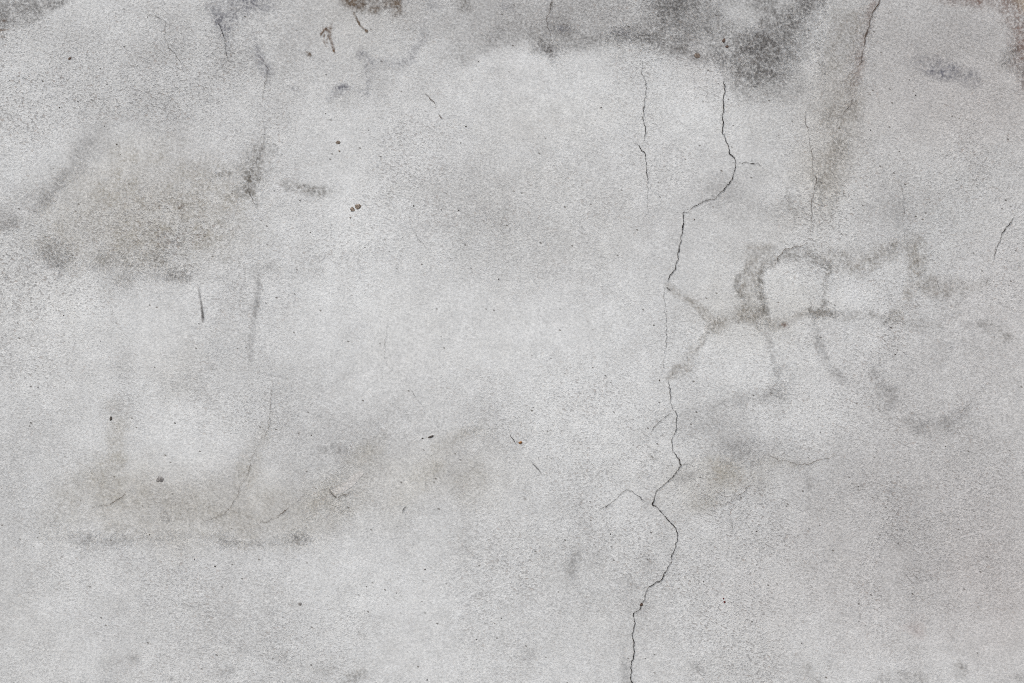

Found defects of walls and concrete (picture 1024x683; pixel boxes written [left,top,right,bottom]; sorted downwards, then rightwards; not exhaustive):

leakage [720,0,794,84]
crack [667,82,758,290]
crack [603,384,682,683]